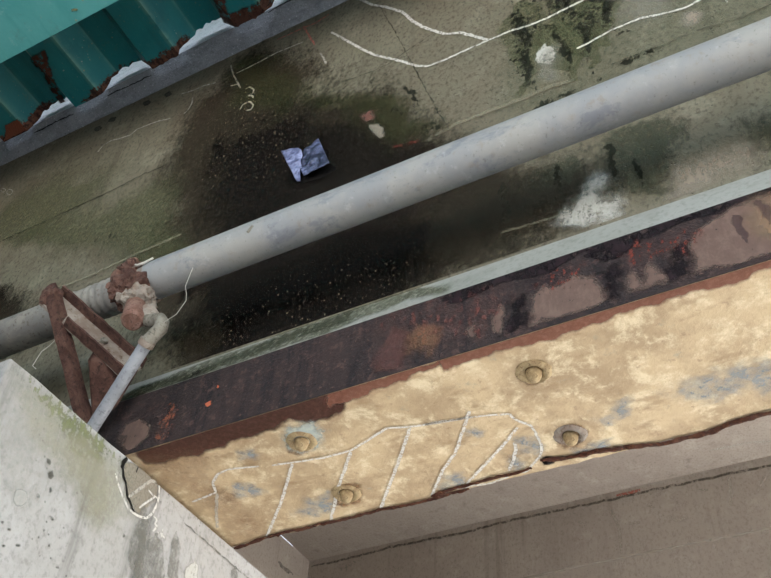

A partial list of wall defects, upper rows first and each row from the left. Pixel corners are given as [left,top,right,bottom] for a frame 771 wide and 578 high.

corrosion [213,0,271,27]
corrosion [30,50,65,104]
damp [499,0,631,109]
corrosion [3,119,27,141]
damp [138,41,463,262]
damp [156,169,618,369]
damp [0,286,25,320]
corrosion [136,229,771,464]
crack [121,457,138,512]